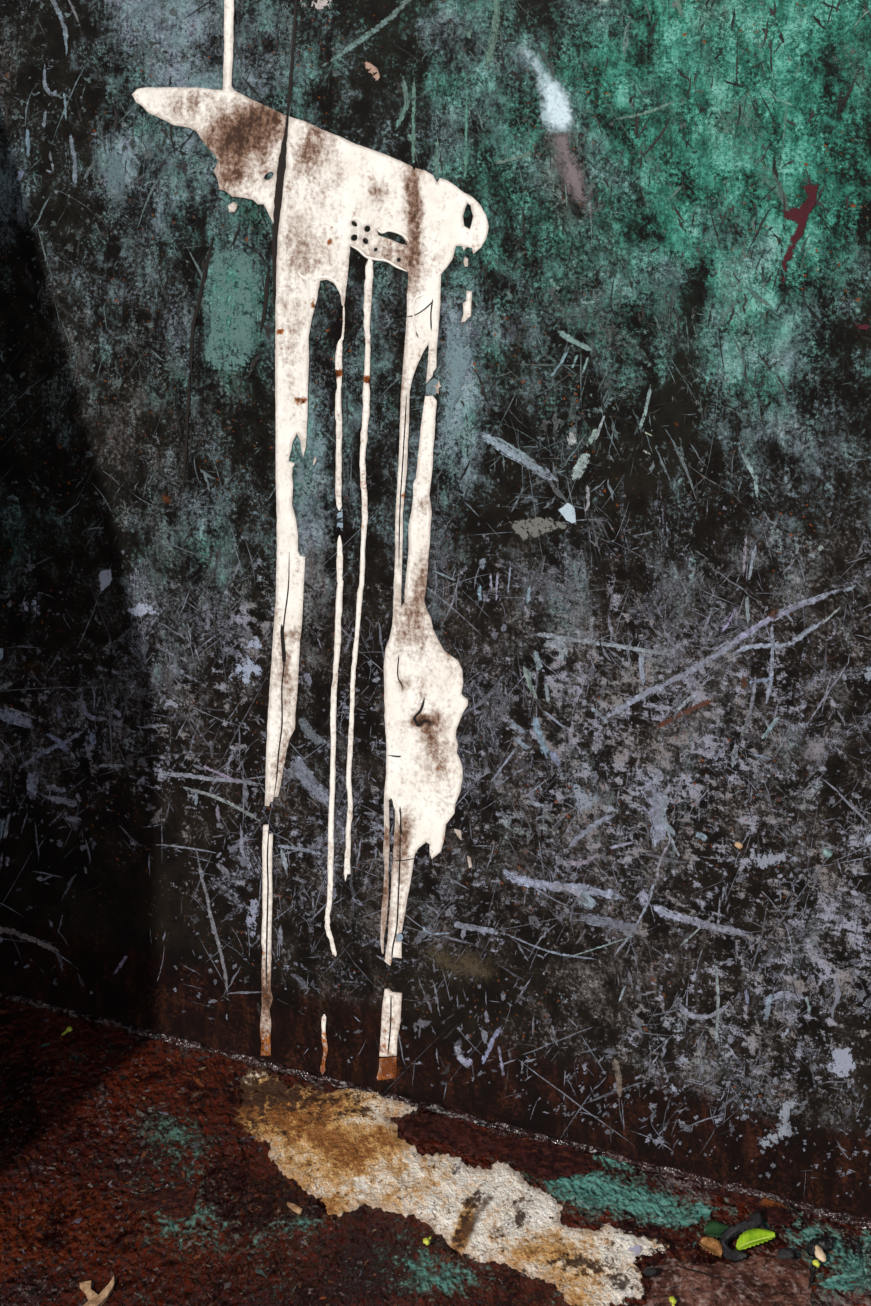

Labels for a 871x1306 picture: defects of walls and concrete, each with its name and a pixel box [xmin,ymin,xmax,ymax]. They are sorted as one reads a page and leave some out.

rust [396,1112,606,1181]
rust [126,1178,198,1222]
water stain [458,1196,492,1247]
rust [686,1187,795,1227]
rust [643,1250,813,1306]